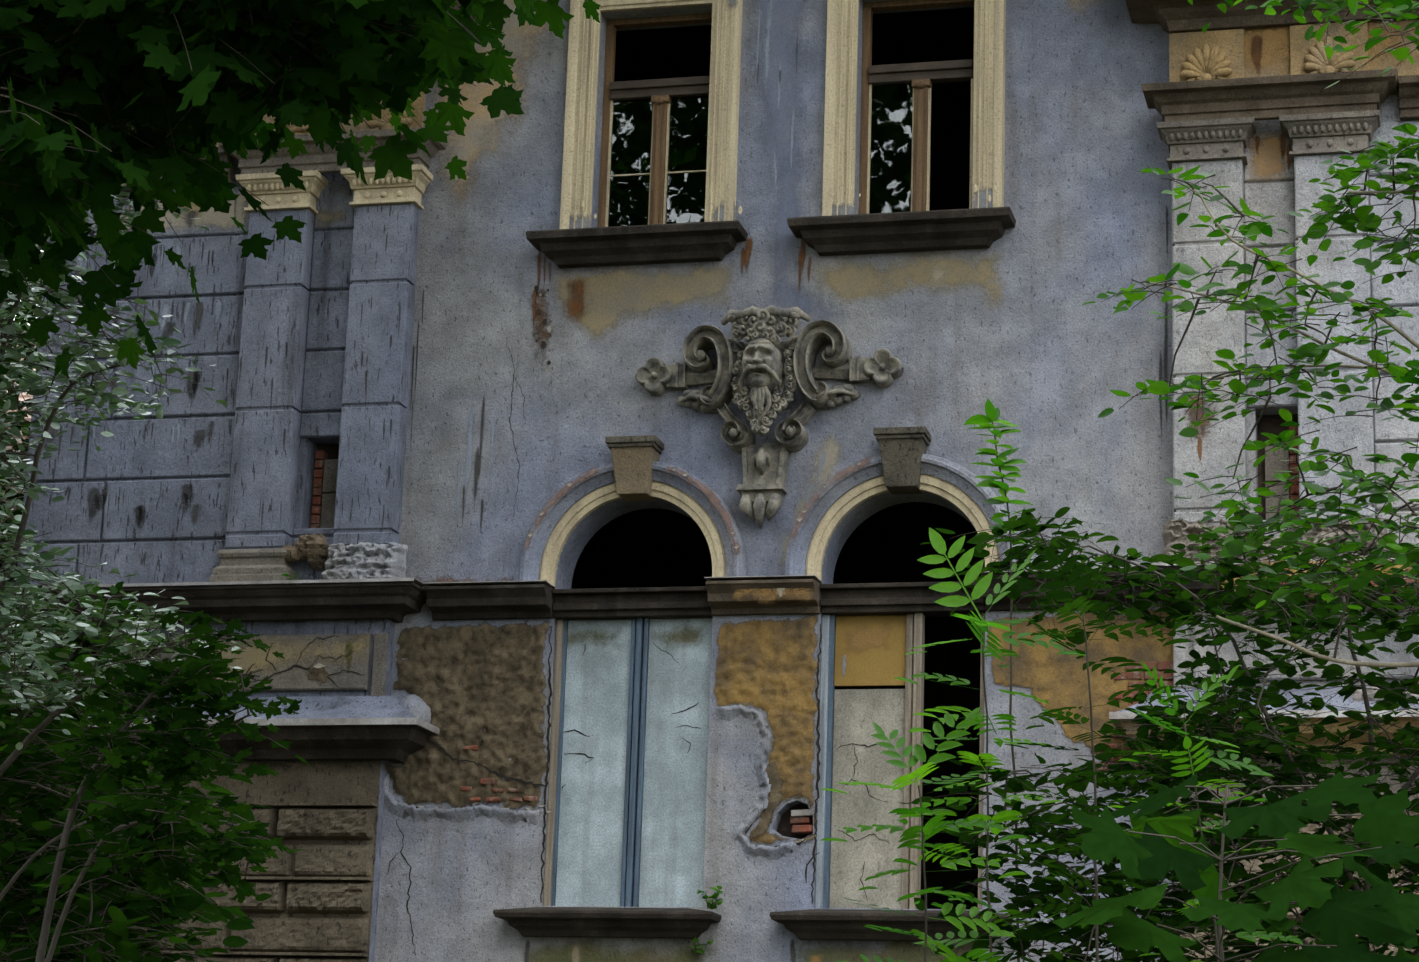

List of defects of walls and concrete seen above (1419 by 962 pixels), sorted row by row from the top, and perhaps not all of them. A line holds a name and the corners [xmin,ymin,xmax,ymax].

corrosion [533,251,551,326]
crack [239,635,361,688]
spalling [383,620,552,825]
spalling [710,615,818,860]
spalling [988,608,1174,771]